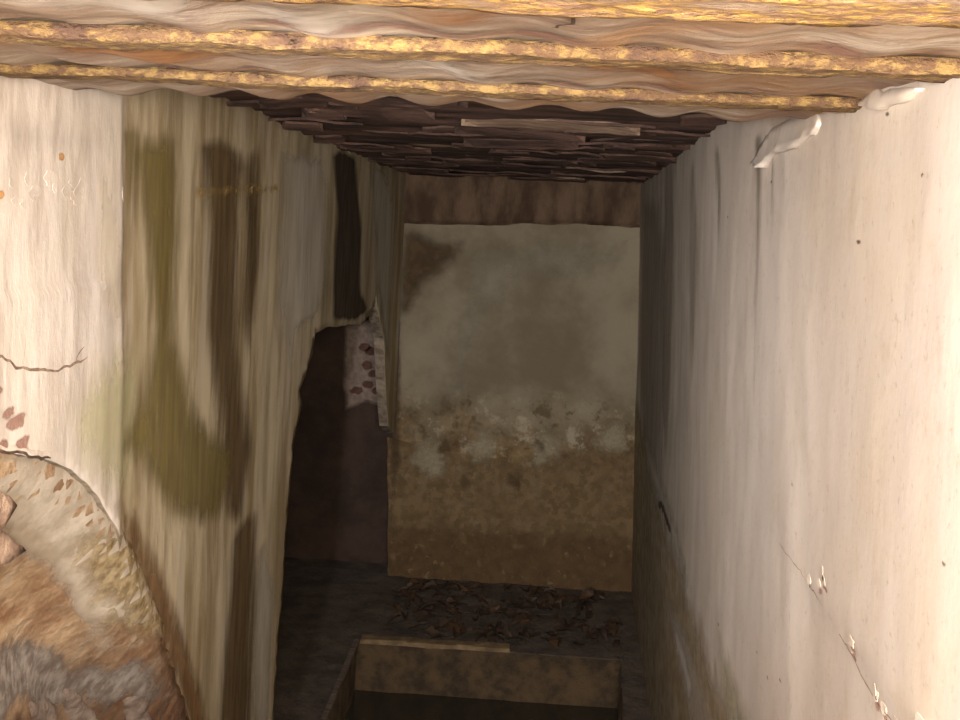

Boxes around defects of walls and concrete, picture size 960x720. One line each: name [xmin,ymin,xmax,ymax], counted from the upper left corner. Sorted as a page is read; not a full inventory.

damp [403,235,453,310]
crack [0,347,88,372]
peeling [344,319,377,408]
crack [0,444,51,461]
damp [197,143,366,720]
spalling [0,407,189,720]
damp [387,351,737,720]
crack [839,634,891,720]